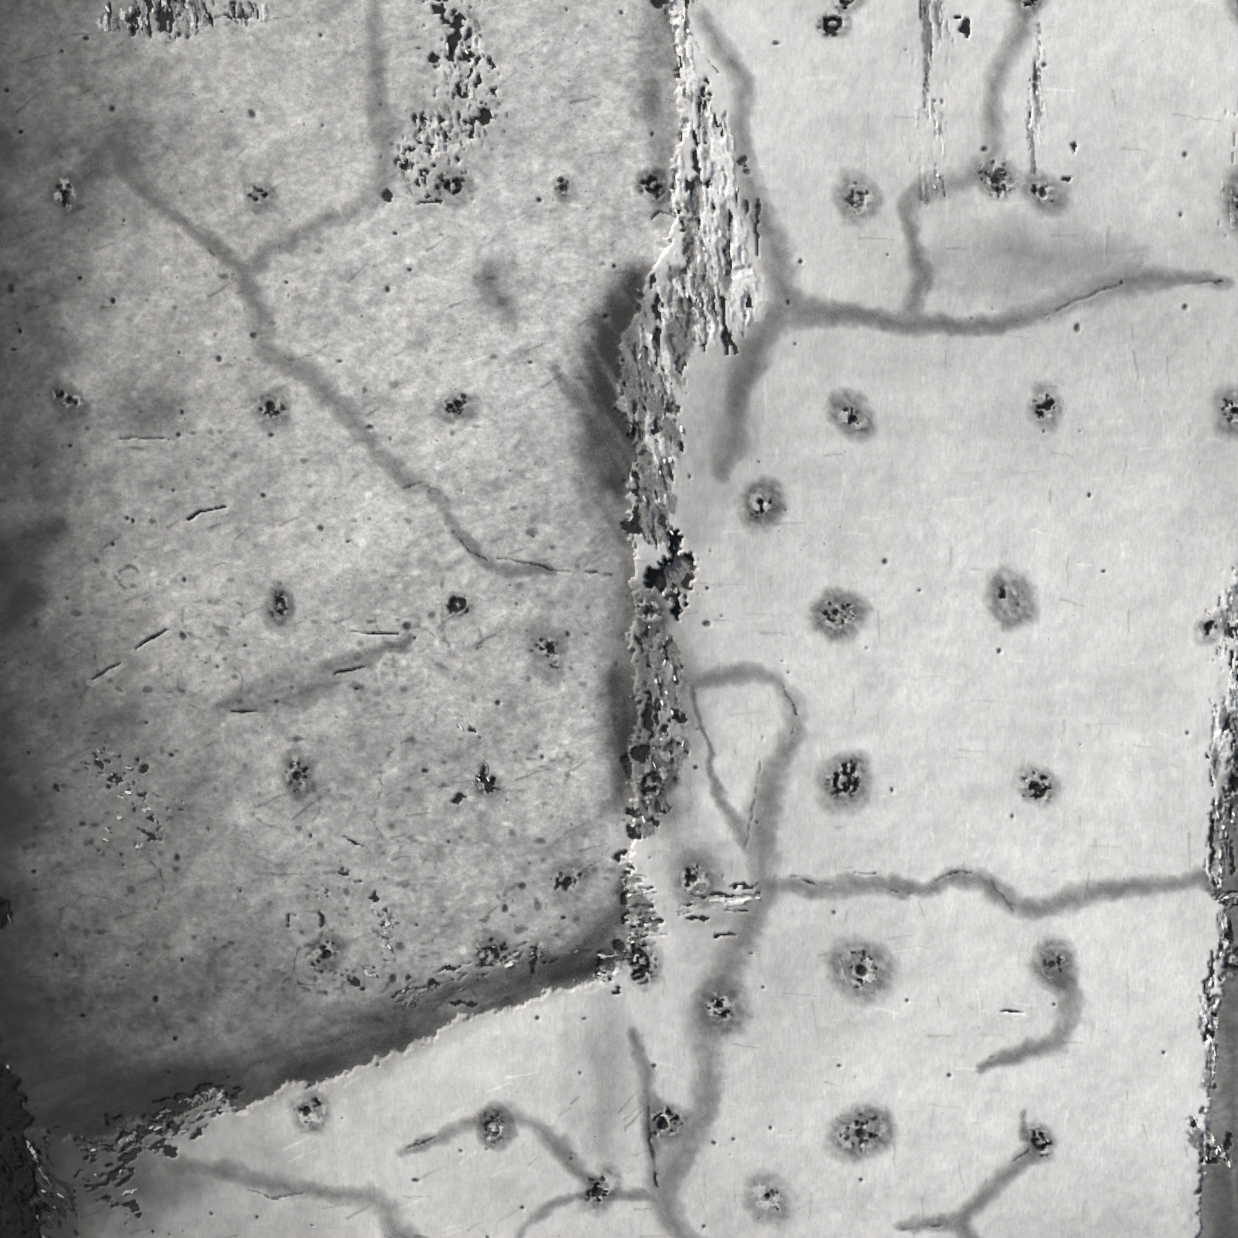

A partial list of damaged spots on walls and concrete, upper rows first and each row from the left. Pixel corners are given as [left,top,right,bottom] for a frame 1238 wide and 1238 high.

crack [93,142,381,456]
peeling [0,0,764,1238]
damp [443,394,472,420]
crack [399,480,554,574]
damp [580,267,647,498]
crack [702,2,1226,471]
crack [170,1162,409,1238]
damp [0,877,656,1238]
crack [400,666,1219,1238]
peeling [1187,569,1238,1238]